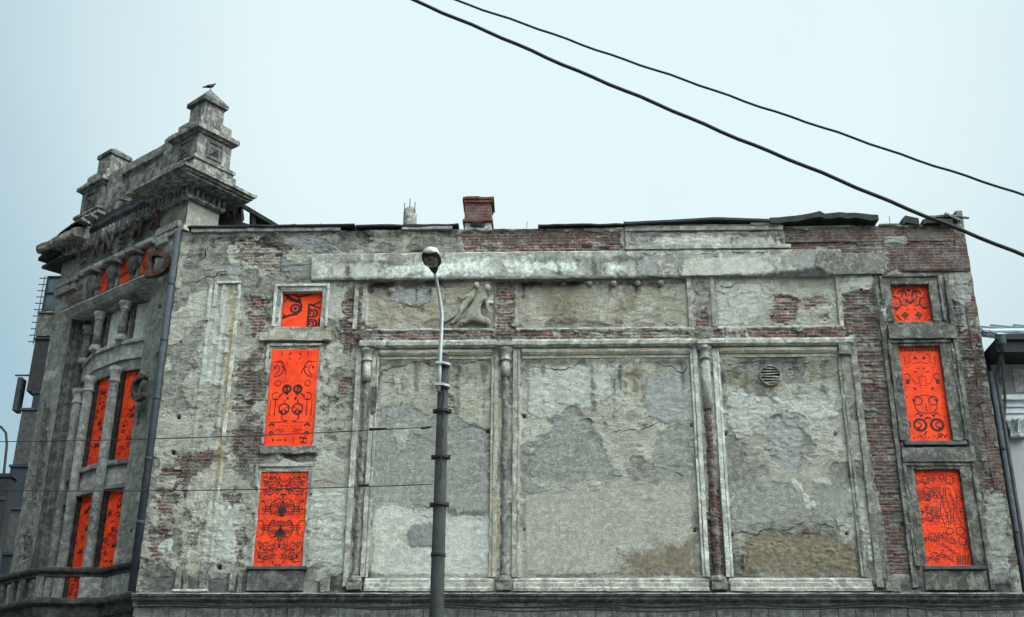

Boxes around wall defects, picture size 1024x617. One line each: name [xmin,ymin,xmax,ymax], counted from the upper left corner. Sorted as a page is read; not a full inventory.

flaking render [212,236,282,280]
flaking render [461,229,622,252]
spalling [781,226,955,274]
flaking render [247,293,270,338]
peeling [371,395,495,517]
peeling [531,406,623,488]
peeling [651,421,695,486]
flaking render [747,289,919,576]
flaking render [156,466,182,516]
flaking render [223,490,241,506]
flaking render [145,530,173,567]
flaking render [235,525,246,559]